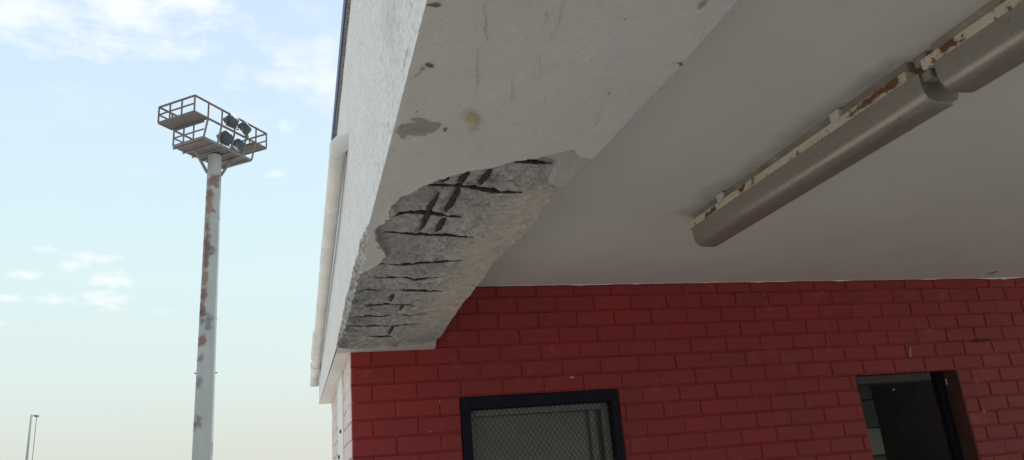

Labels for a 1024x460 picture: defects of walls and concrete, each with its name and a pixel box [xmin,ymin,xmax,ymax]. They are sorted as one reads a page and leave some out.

peeling [387,111,447,139]
corrosion [200,238,209,317]
spalling [336,150,591,351]